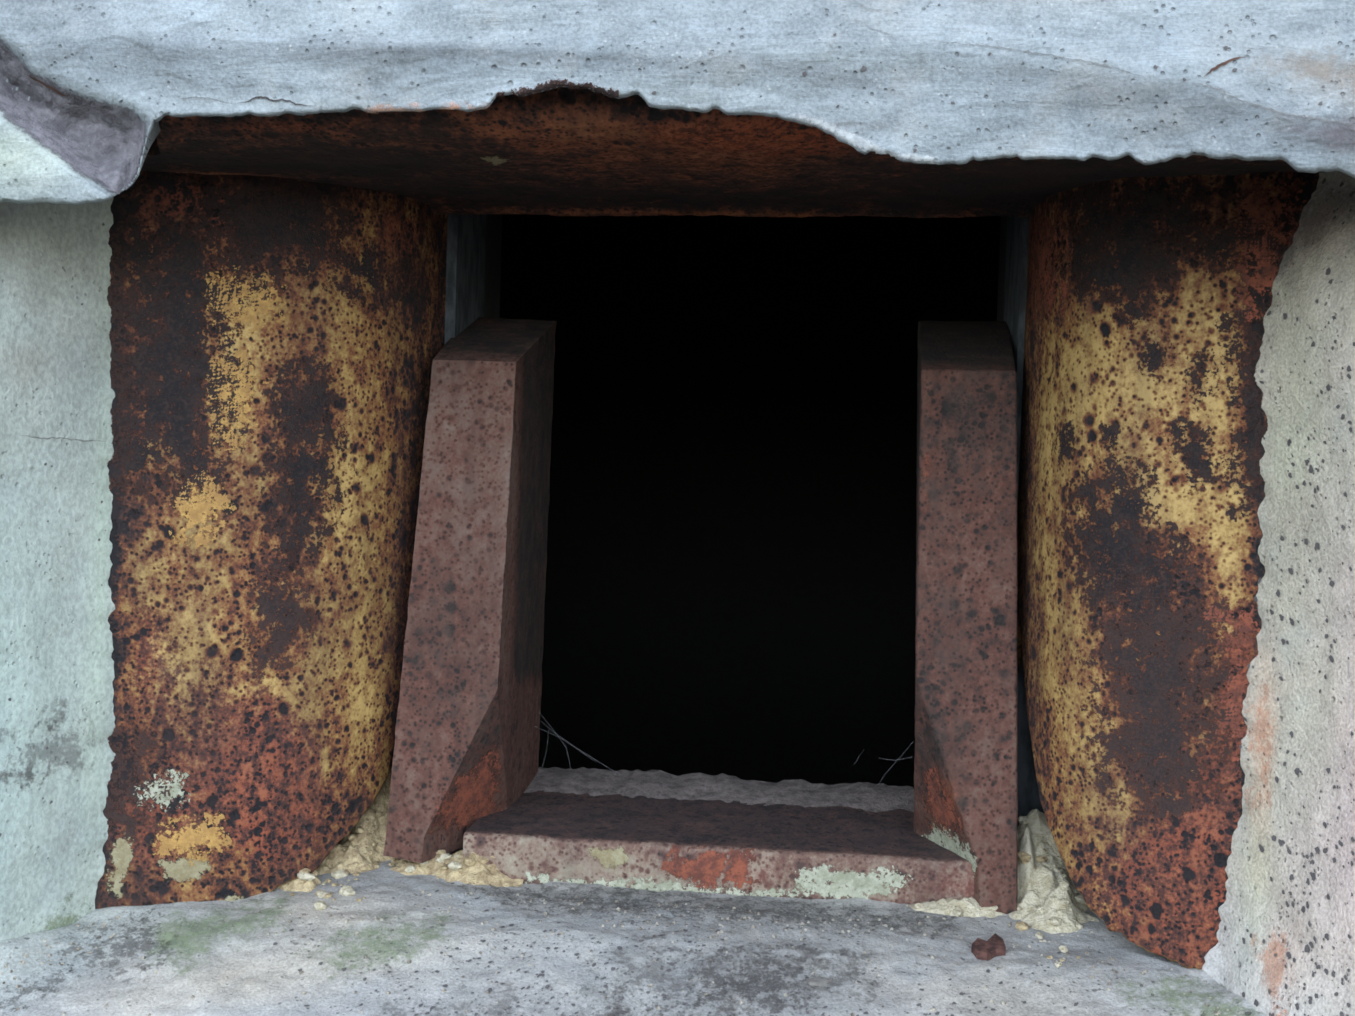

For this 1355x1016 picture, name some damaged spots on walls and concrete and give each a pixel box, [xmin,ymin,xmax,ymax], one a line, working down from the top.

spalling [0,39,151,194]
spalling [496,78,619,98]
spalling [793,114,937,164]
rust [313,230,422,312]
rust [107,203,359,684]
rust [1052,172,1314,827]
rust [103,720,173,844]
rust [428,744,504,833]
rust [661,845,760,890]